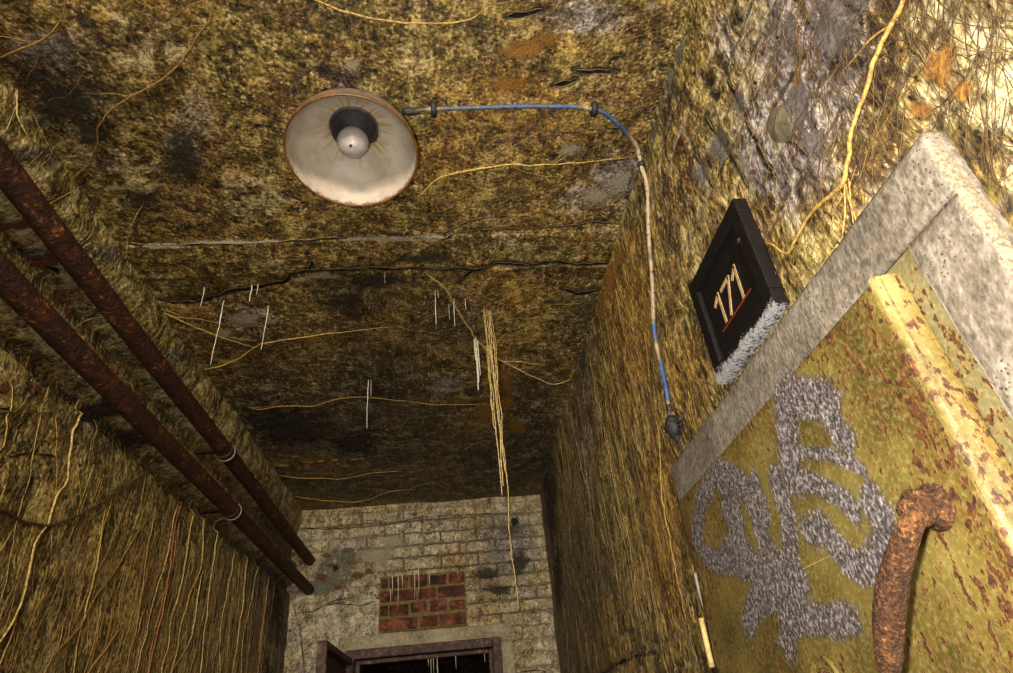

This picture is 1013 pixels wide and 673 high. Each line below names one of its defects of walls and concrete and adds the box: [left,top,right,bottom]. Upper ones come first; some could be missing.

crack [403,215,619,240]
crack [126,236,608,305]
spalling [310,552,372,596]
damp [471,552,530,596]